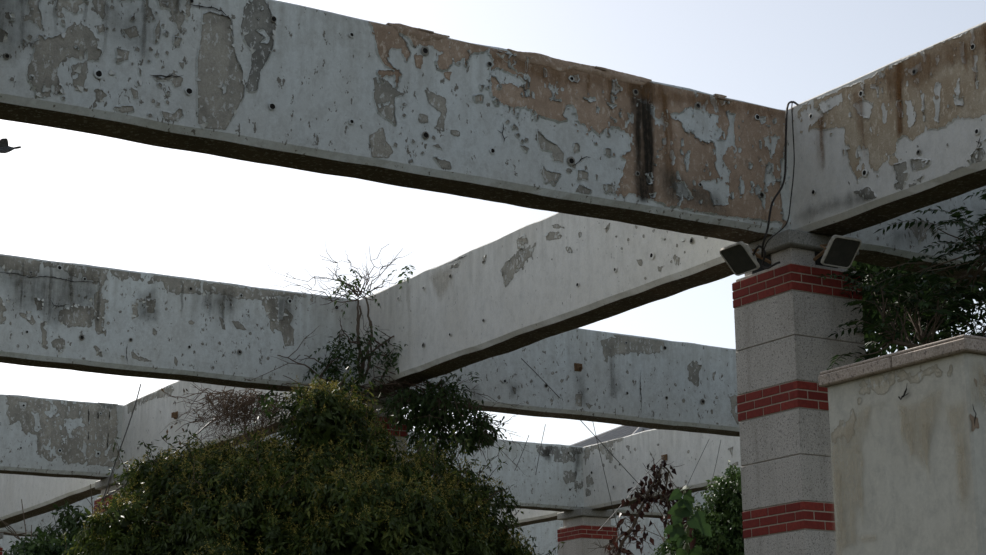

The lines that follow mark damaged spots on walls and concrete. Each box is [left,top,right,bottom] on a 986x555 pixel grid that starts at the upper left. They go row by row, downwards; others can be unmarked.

peeling [0,0,278,130]
peeling [368,21,986,228]
rust [892,63,915,134]
peeling [500,224,572,287]
peeling [635,225,686,272]
peeling [601,334,665,363]
peeling [687,360,702,387]
peeling [6,386,174,469]